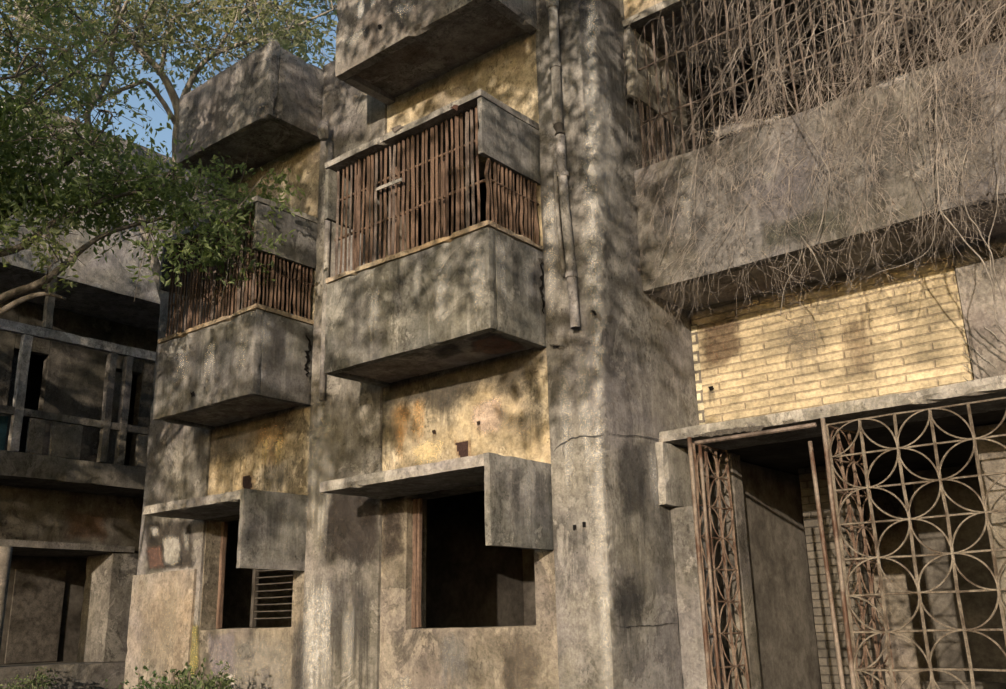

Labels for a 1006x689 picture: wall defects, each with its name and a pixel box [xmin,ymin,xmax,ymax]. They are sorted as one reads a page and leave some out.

damp [325,495,404,565]
damp [291,626,306,689]
damp [352,595,368,666]